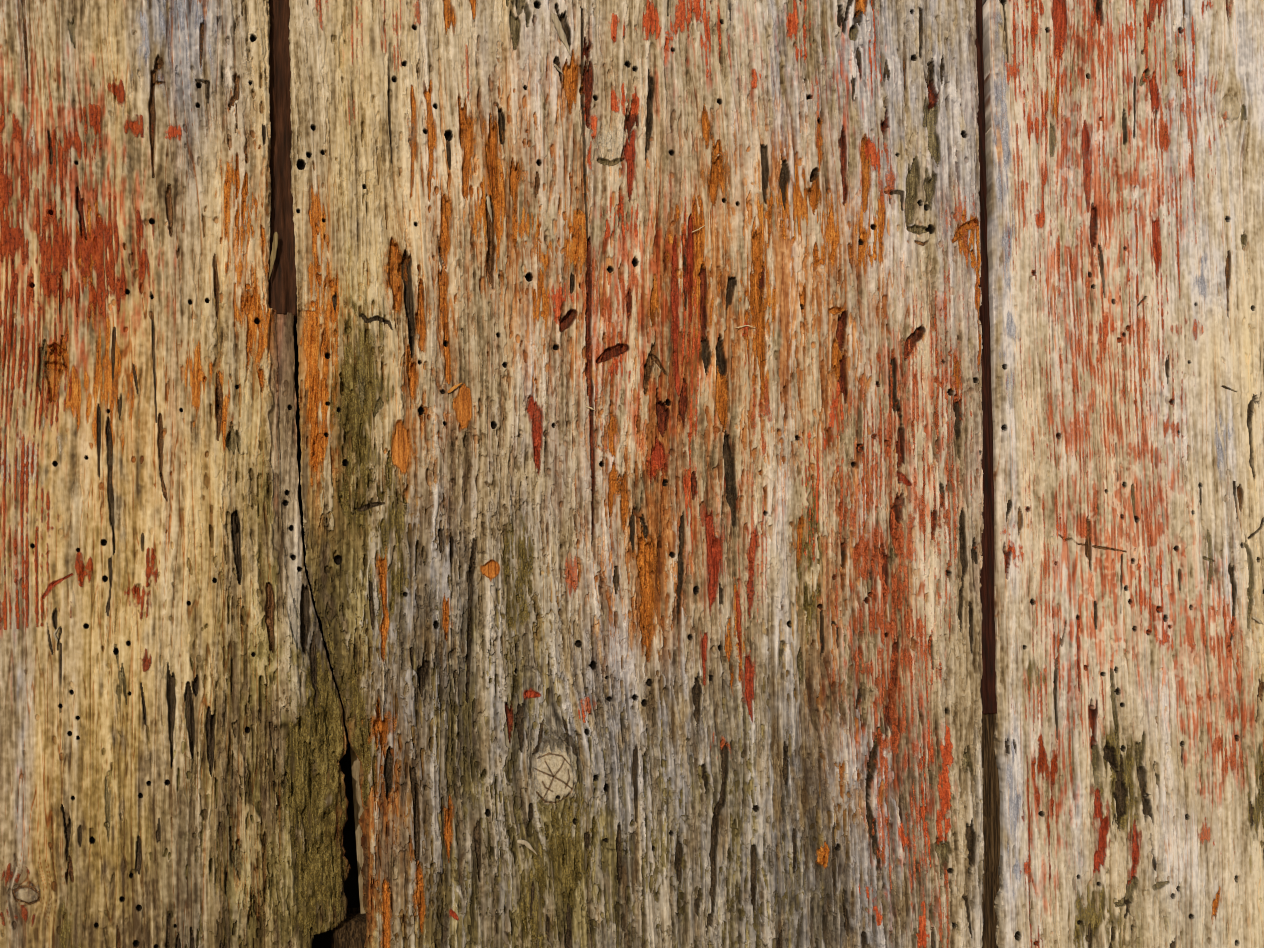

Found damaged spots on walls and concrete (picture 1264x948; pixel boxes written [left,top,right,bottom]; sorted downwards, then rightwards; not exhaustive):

spalling [124,56,181,178]
hole [761,144,789,210]
spalling [838,55,979,263]
peeling [0,101,160,630]
spalling [157,413,168,501]
spalling [231,511,242,585]
spalling [548,0,767,727]
spalling [742,230,772,454]
peeling [793,268,982,948]
spalling [1003,0,1254,948]
spalling [1237,393,1261,511]
spalling [694,733,731,932]